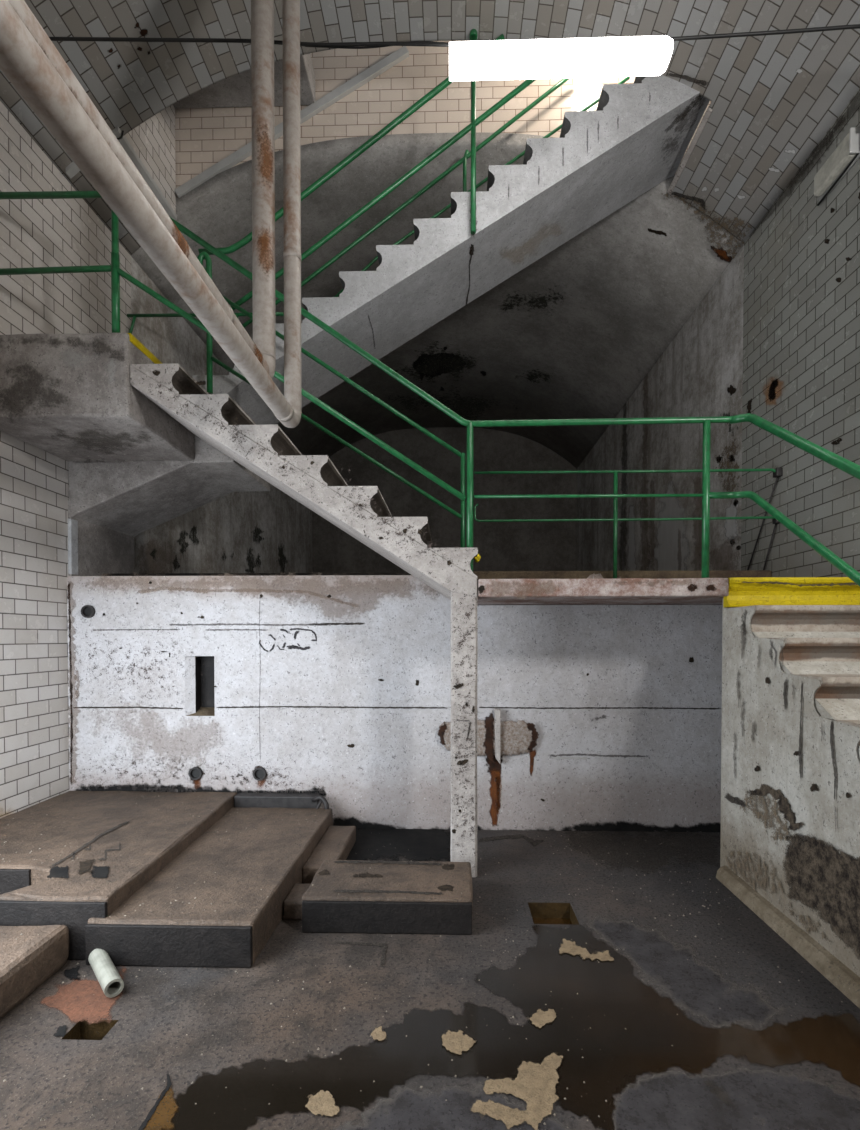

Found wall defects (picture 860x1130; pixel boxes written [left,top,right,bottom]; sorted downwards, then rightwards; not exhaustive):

crack [466,233,475,304]
corrosion [765,378,782,404]
leakage [172,526,199,571]
leakage [222,527,264,573]
corrosion [438,722,451,751]
corrosion [477,708,539,826]
spalling [723,765,860,959]